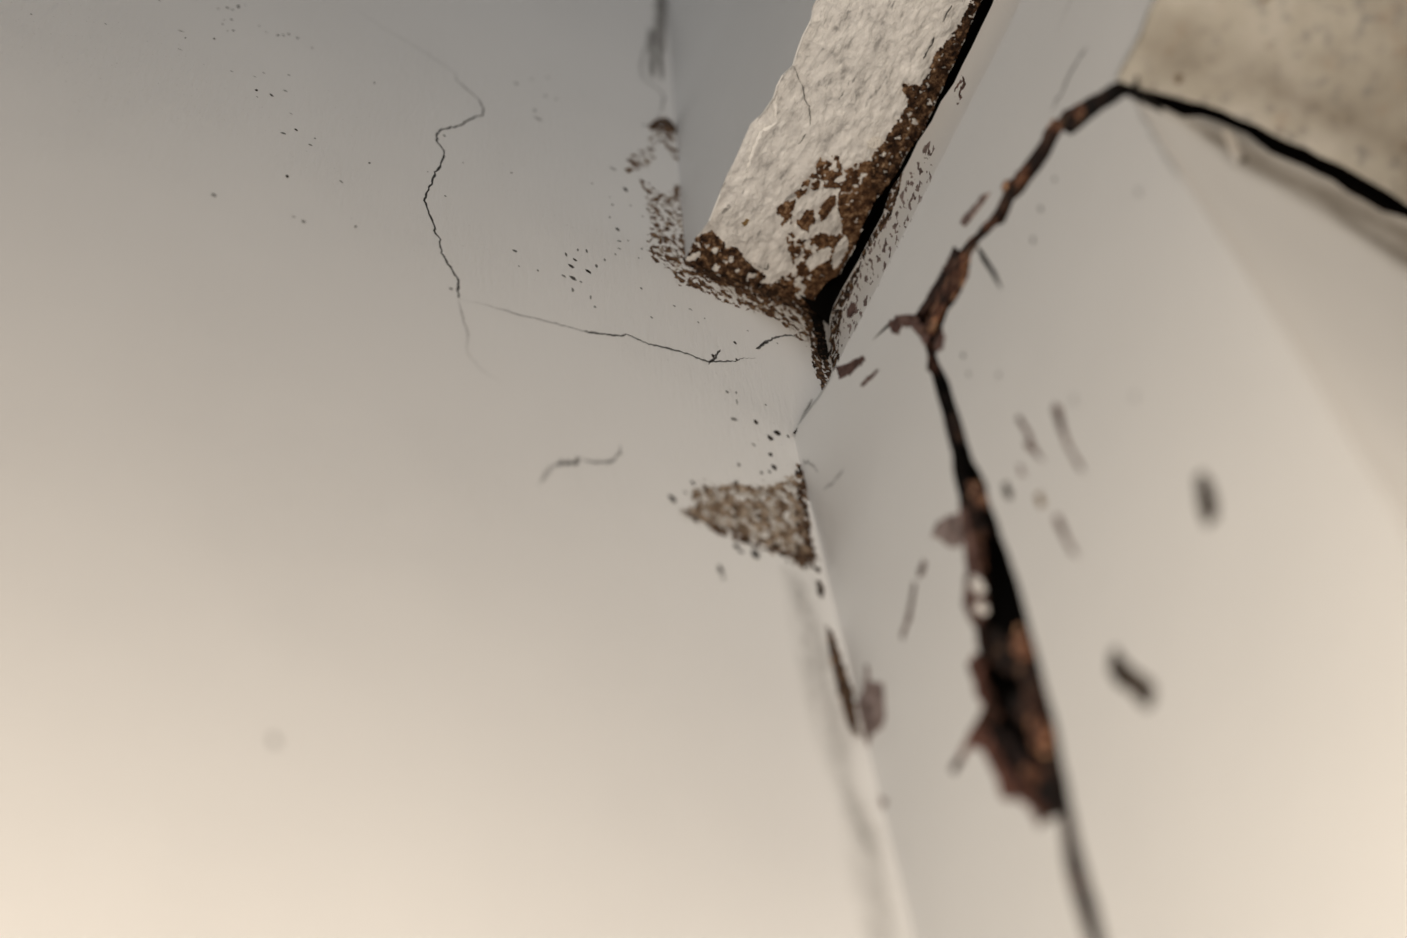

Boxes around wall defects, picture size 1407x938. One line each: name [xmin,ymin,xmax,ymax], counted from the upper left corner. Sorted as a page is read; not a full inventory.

crack [423,102,484,298]
crack [585,0,994,364]
flaking render [609,0,981,390]
peeling [960,192,991,227]
flaking render [680,420,821,573]
crack [888,75,1407,829]